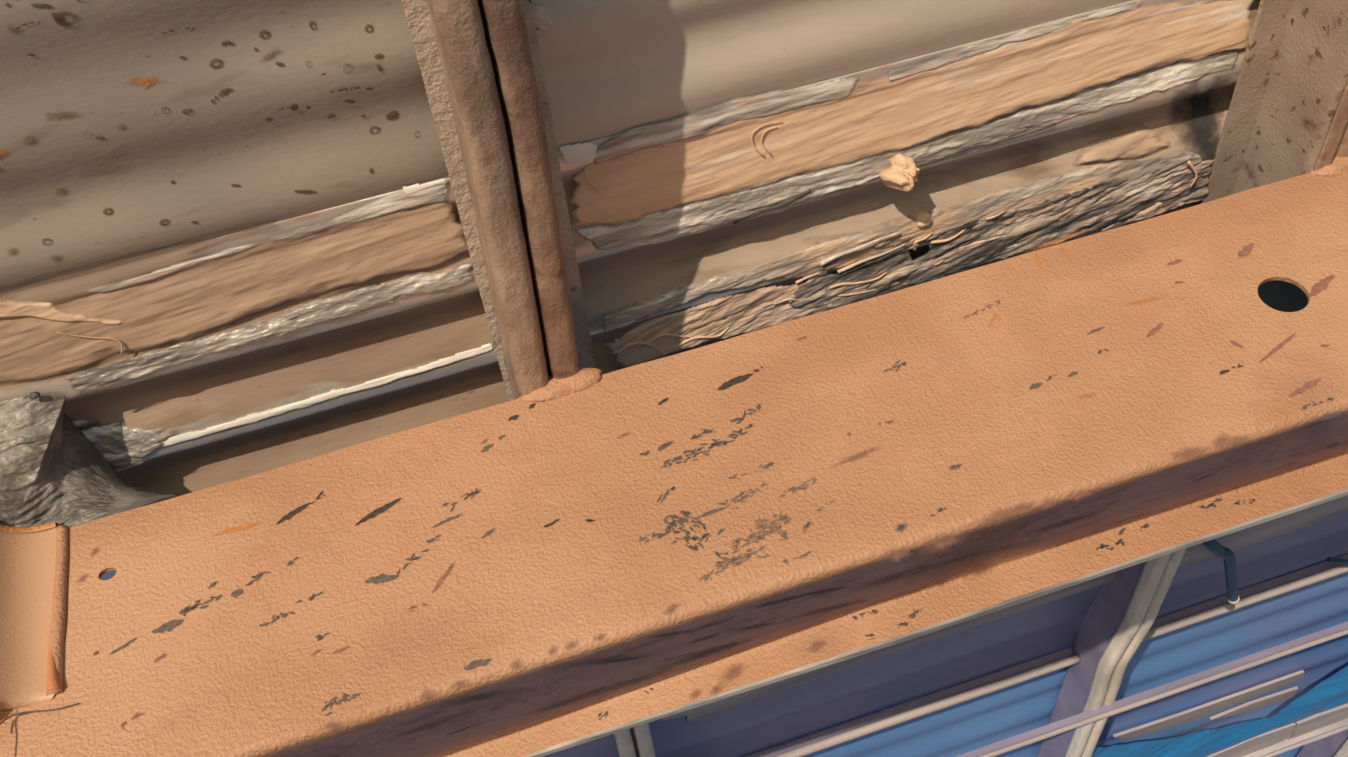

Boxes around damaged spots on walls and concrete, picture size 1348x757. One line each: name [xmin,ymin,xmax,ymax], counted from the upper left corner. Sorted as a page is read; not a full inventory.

rust [10,3,78,32]
rust [210,40,235,68]
rust [254,30,284,66]
rust [330,87,399,134]
peeling [640,403,761,468]
peeling [276,491,326,524]
peeling [354,498,402,526]
peeling [365,488,481,584]
peeling [638,462,835,581]
peeling [1096,523,1149,550]
peeling [93,571,270,655]
peeling [321,693,361,716]